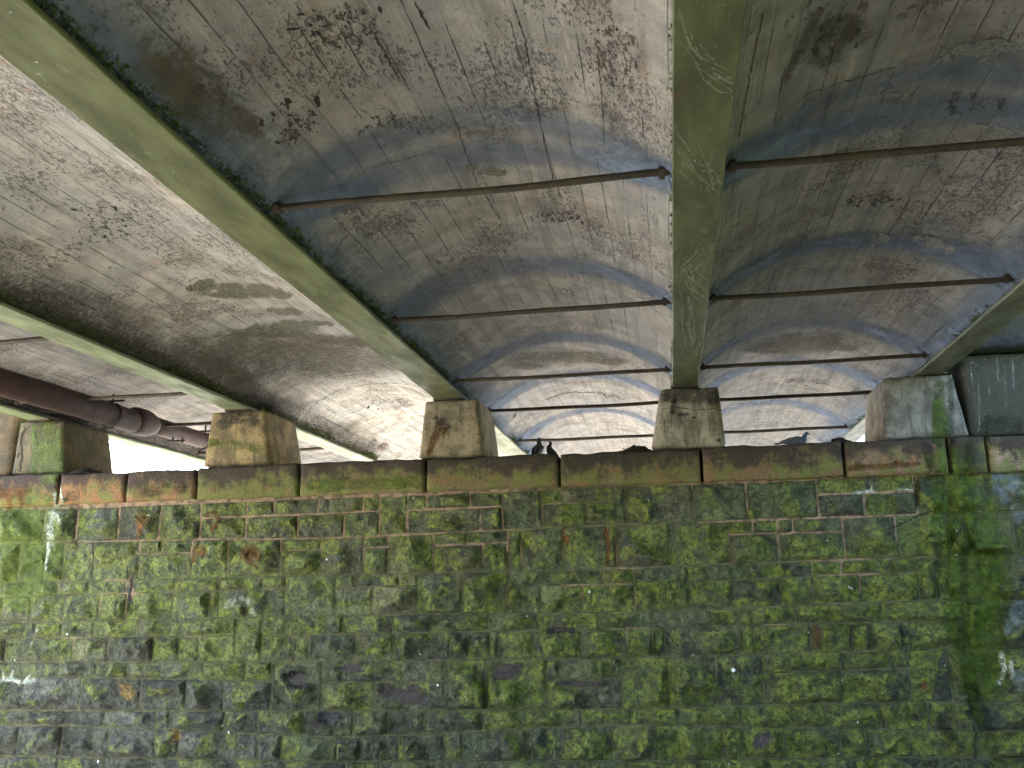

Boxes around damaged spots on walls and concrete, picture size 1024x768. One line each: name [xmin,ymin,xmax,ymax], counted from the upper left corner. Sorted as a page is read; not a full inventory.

crack [773,45,910,131]
damp [33,0,868,454]
damp [0,276,378,474]
rust [427,424,446,455]
damp [929,400,1014,723]